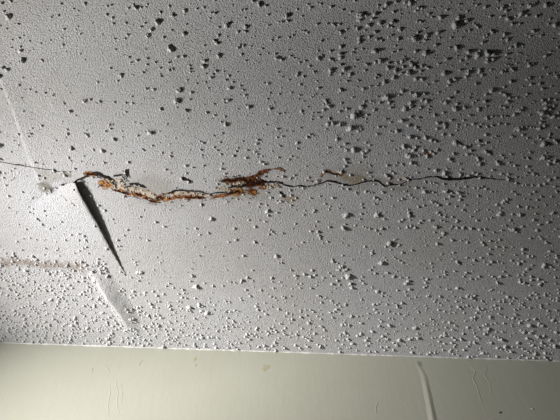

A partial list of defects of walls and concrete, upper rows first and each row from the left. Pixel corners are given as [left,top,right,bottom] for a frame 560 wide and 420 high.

crack [73,169,145,188]
rust [83,167,284,204]
crack [163,177,245,195]
crack [262,170,518,198]